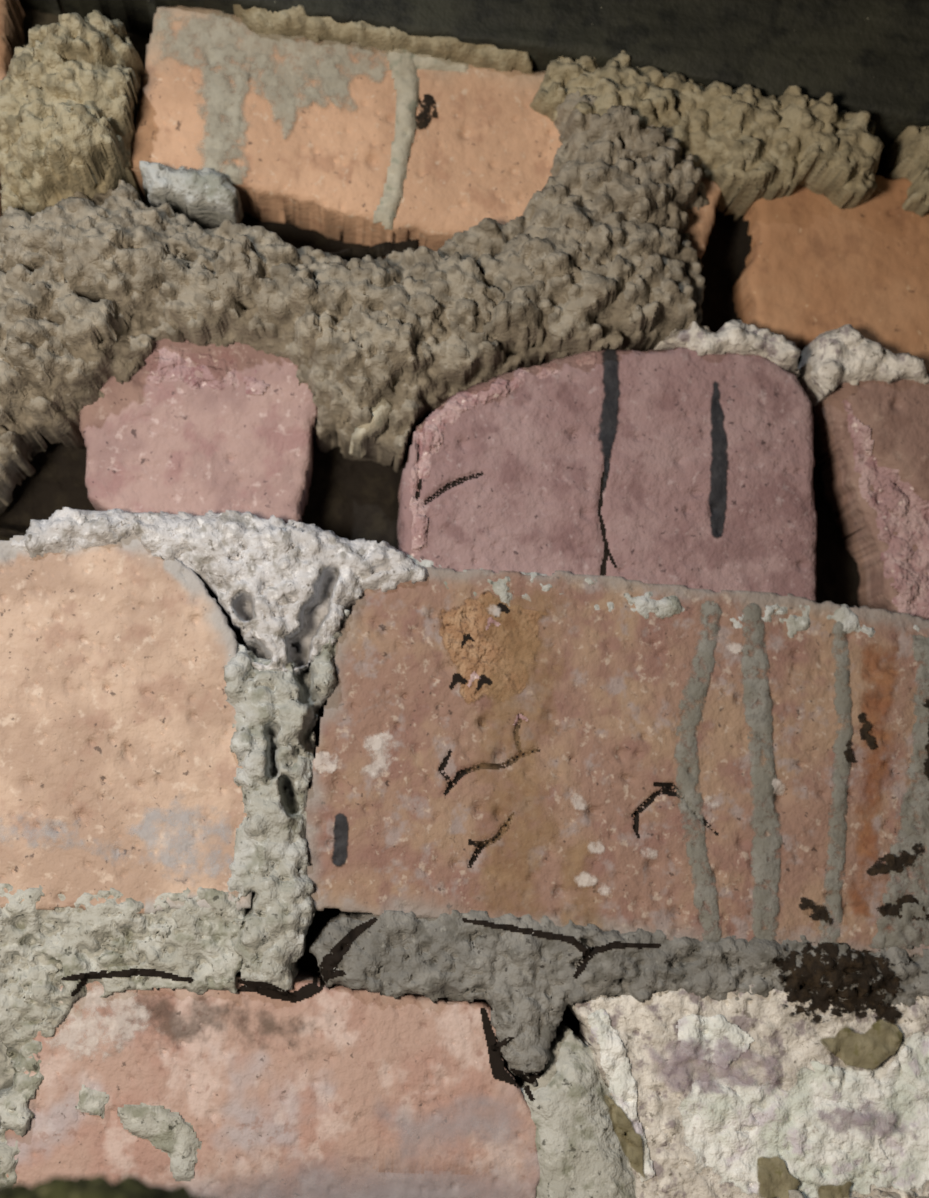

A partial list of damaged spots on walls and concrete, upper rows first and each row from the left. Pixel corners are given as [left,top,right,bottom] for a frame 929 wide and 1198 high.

crack [598,463,617,576]
water stain [314,752,336,773]
water stain [364,734,388,775]
crack [438,712,540,796]
crack [631,782,718,838]
crack [467,812,514,868]
water stain [577,873,607,893]